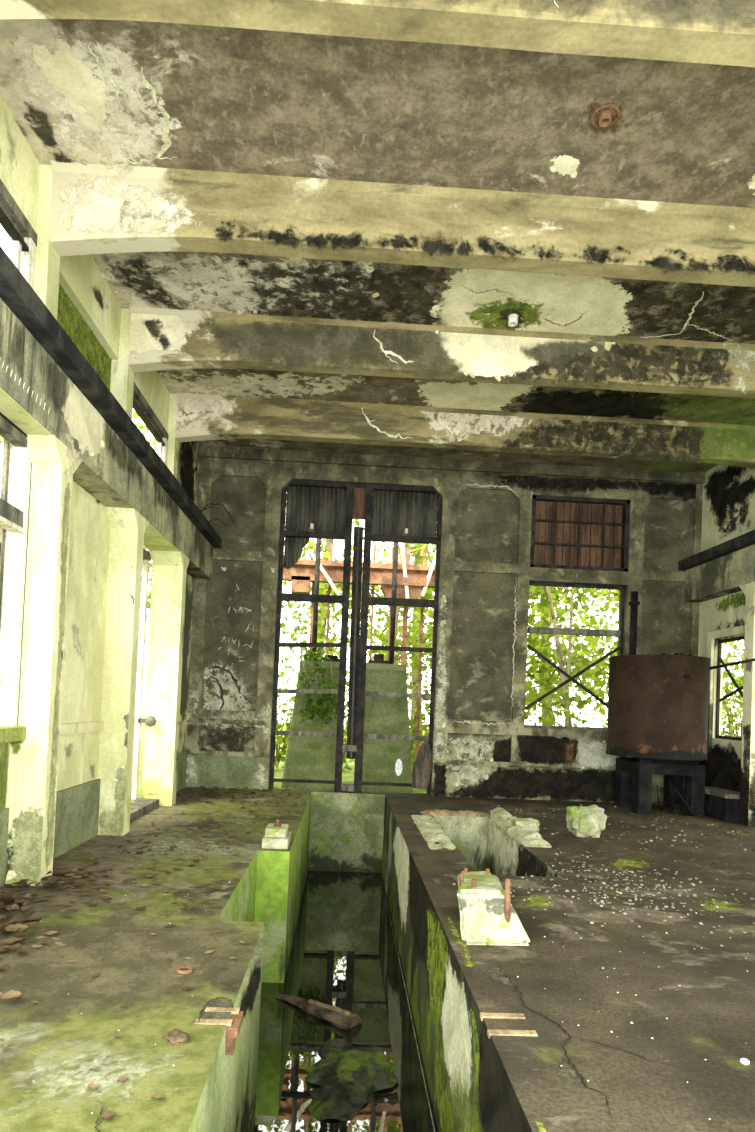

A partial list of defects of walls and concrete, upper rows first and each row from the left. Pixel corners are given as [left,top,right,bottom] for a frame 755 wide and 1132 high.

peeling [3,22,195,238]
corrosion [584,102,624,134]
damp [200,221,562,380]
crack [362,408,413,439]
crack [373,330,414,364]
peeling [415,268,633,442]
damp [501,246,755,462]
crack [640,292,732,340]
damp [466,465,755,536]
damp [451,581,517,725]
peeling [576,740,619,770]
crack [496,963,657,1116]